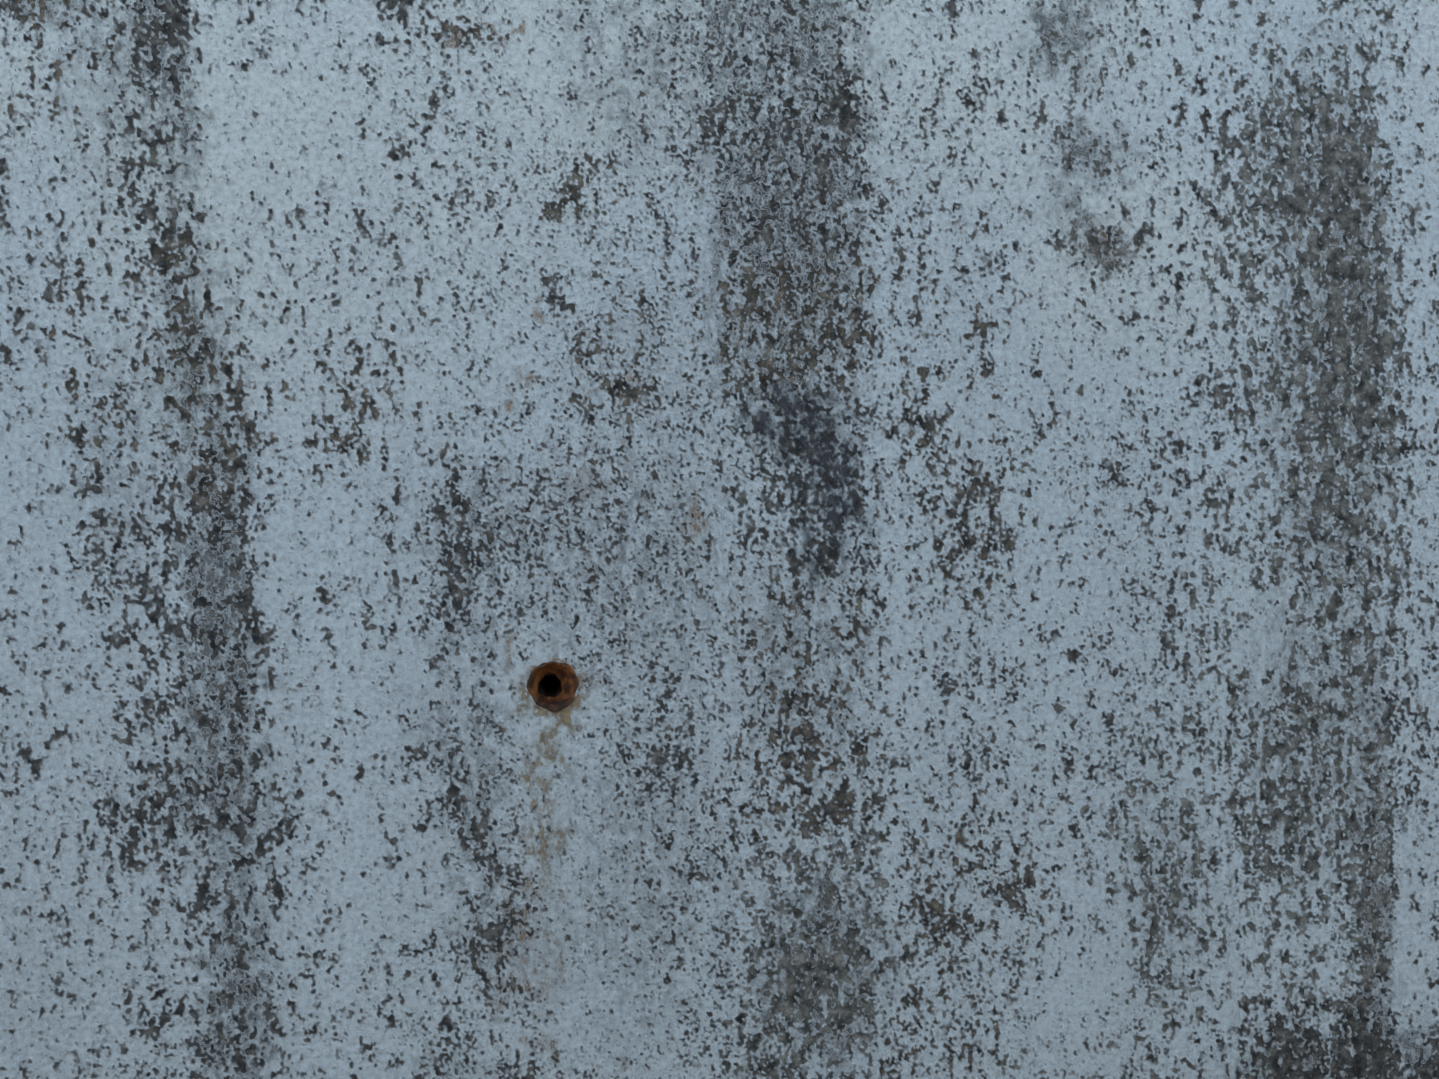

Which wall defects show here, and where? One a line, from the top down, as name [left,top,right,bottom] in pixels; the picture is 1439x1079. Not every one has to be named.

water stain [123,0,198,177]
water stain [701,0,877,585]
water stain [1299,265,1383,487]
water stain [155,282,268,841]
water stain [196,913,278,1077]
corrosion [504,666,591,942]
water stain [761,873,878,1063]
water stain [1250,753,1437,1079]